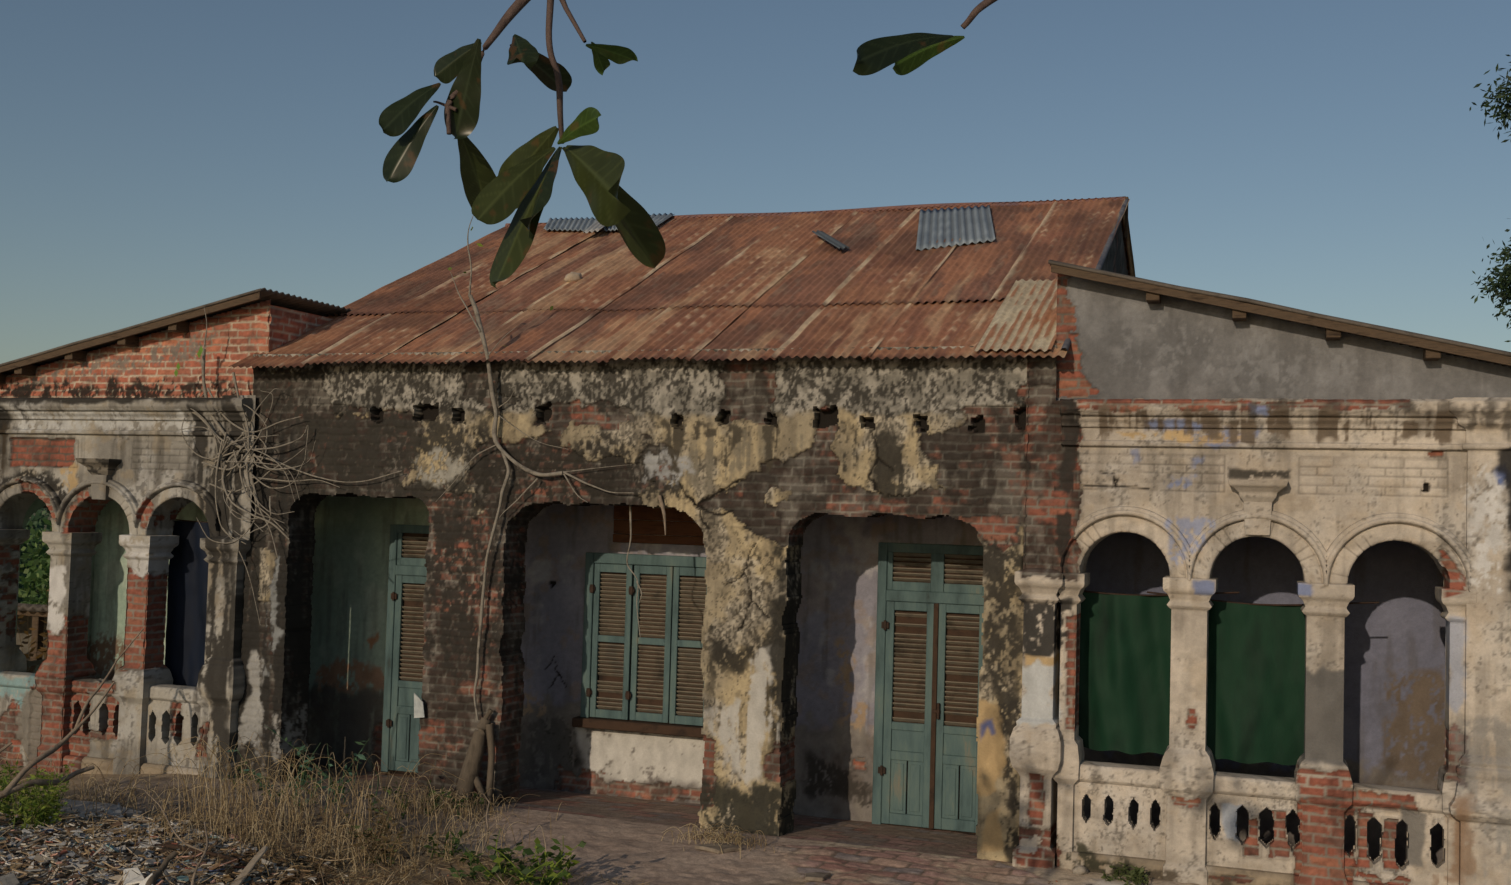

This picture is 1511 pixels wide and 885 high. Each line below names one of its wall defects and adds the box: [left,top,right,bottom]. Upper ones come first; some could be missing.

flaking render [702,274,1251,581]
water stain [1076,294,1511,596]
flaking render [0,544,21,641]
flaking render [0,567,169,773]
flaking render [236,360,665,806]
water stain [518,525,873,836]
flaking render [763,737,795,784]
flaking render [976,697,1063,870]
flaking render [1024,612,1081,731]
flaking render [1209,764,1419,885]